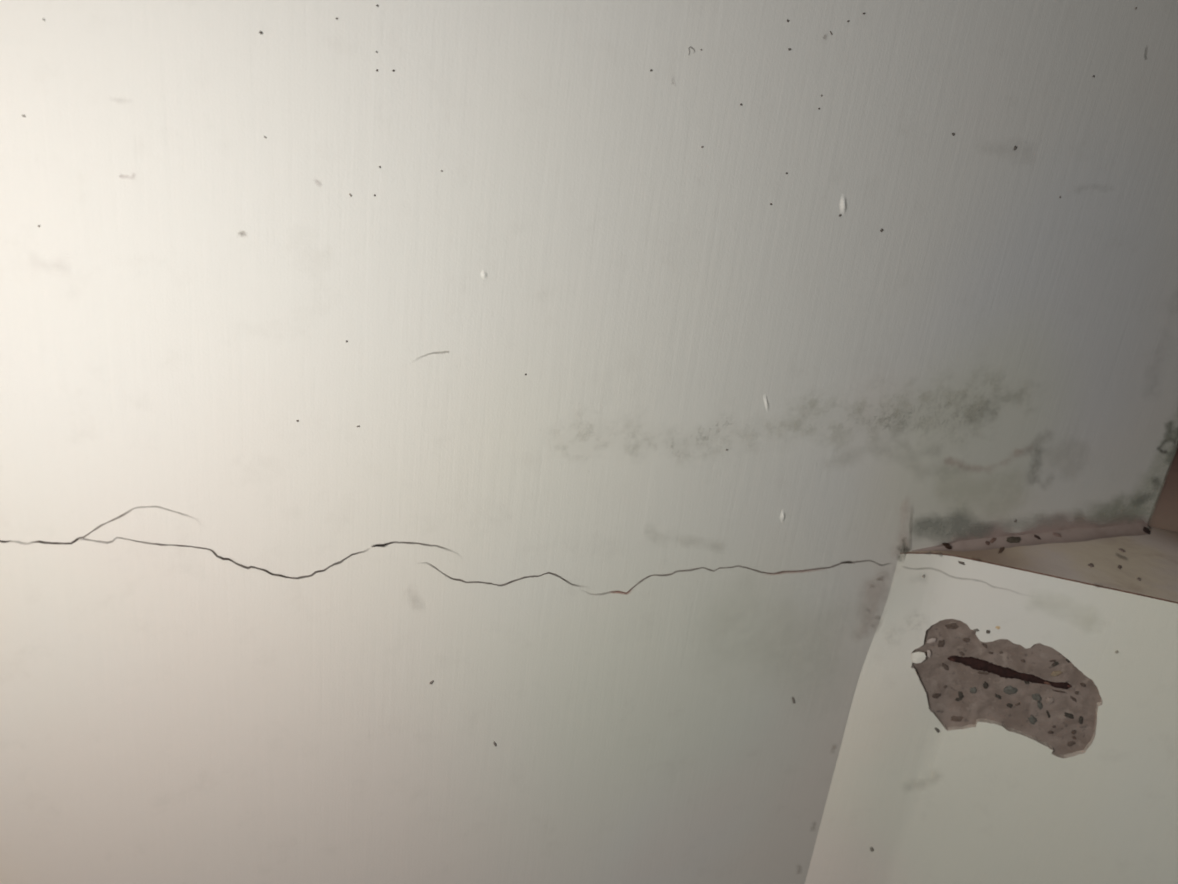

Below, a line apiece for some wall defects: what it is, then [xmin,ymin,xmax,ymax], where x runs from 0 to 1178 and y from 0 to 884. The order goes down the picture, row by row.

crack [0,515,123,544]
crack [136,541,572,586]
spalling [911,619,1103,758]